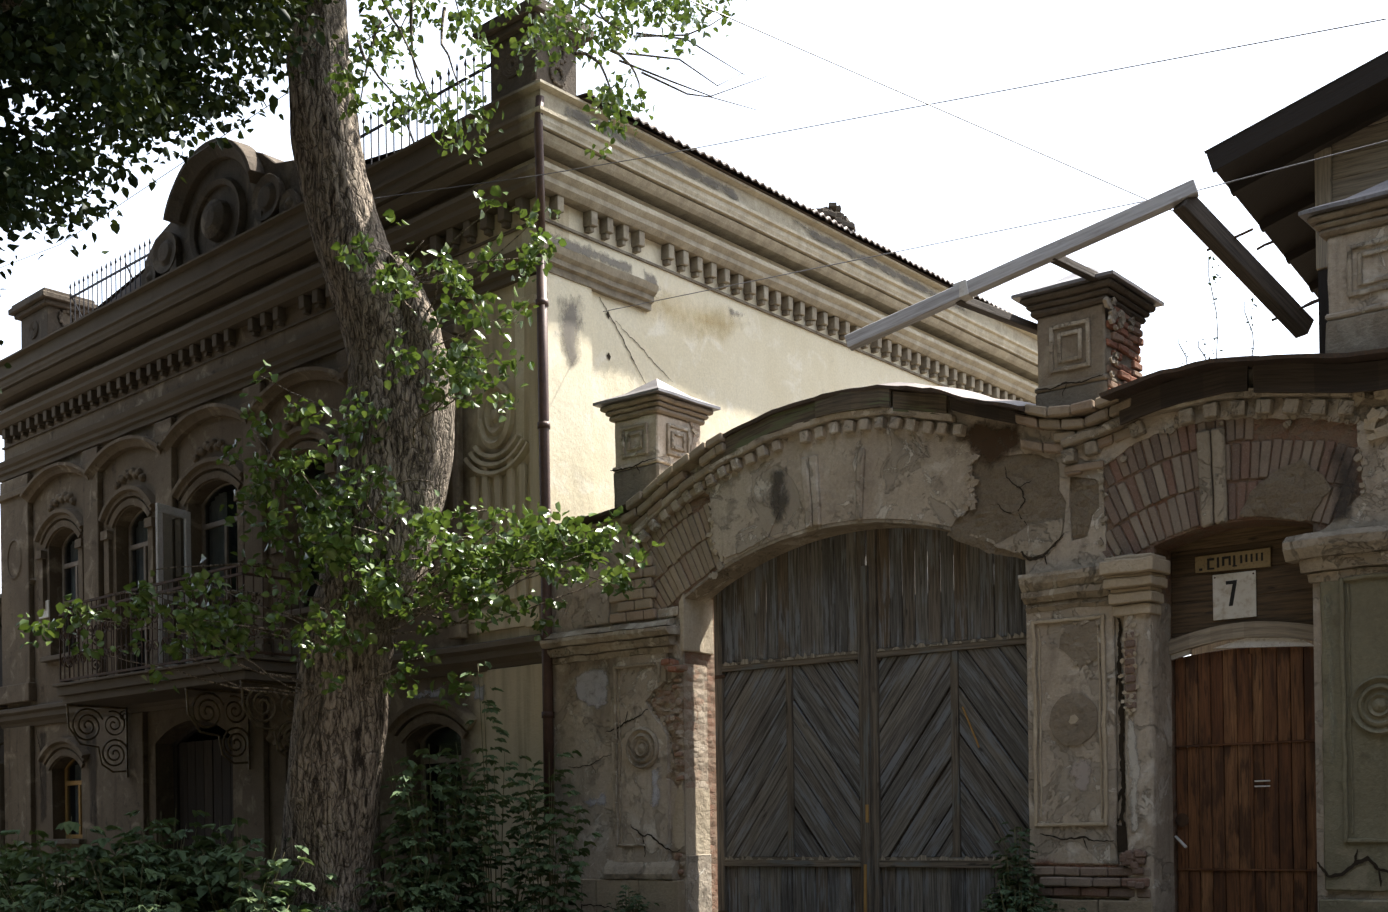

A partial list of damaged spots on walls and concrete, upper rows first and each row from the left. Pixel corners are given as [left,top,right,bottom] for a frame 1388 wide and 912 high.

spalling [1102,296,1144,390]
spalling [947,389,1388,560]
crack [1317,849,1388,887]